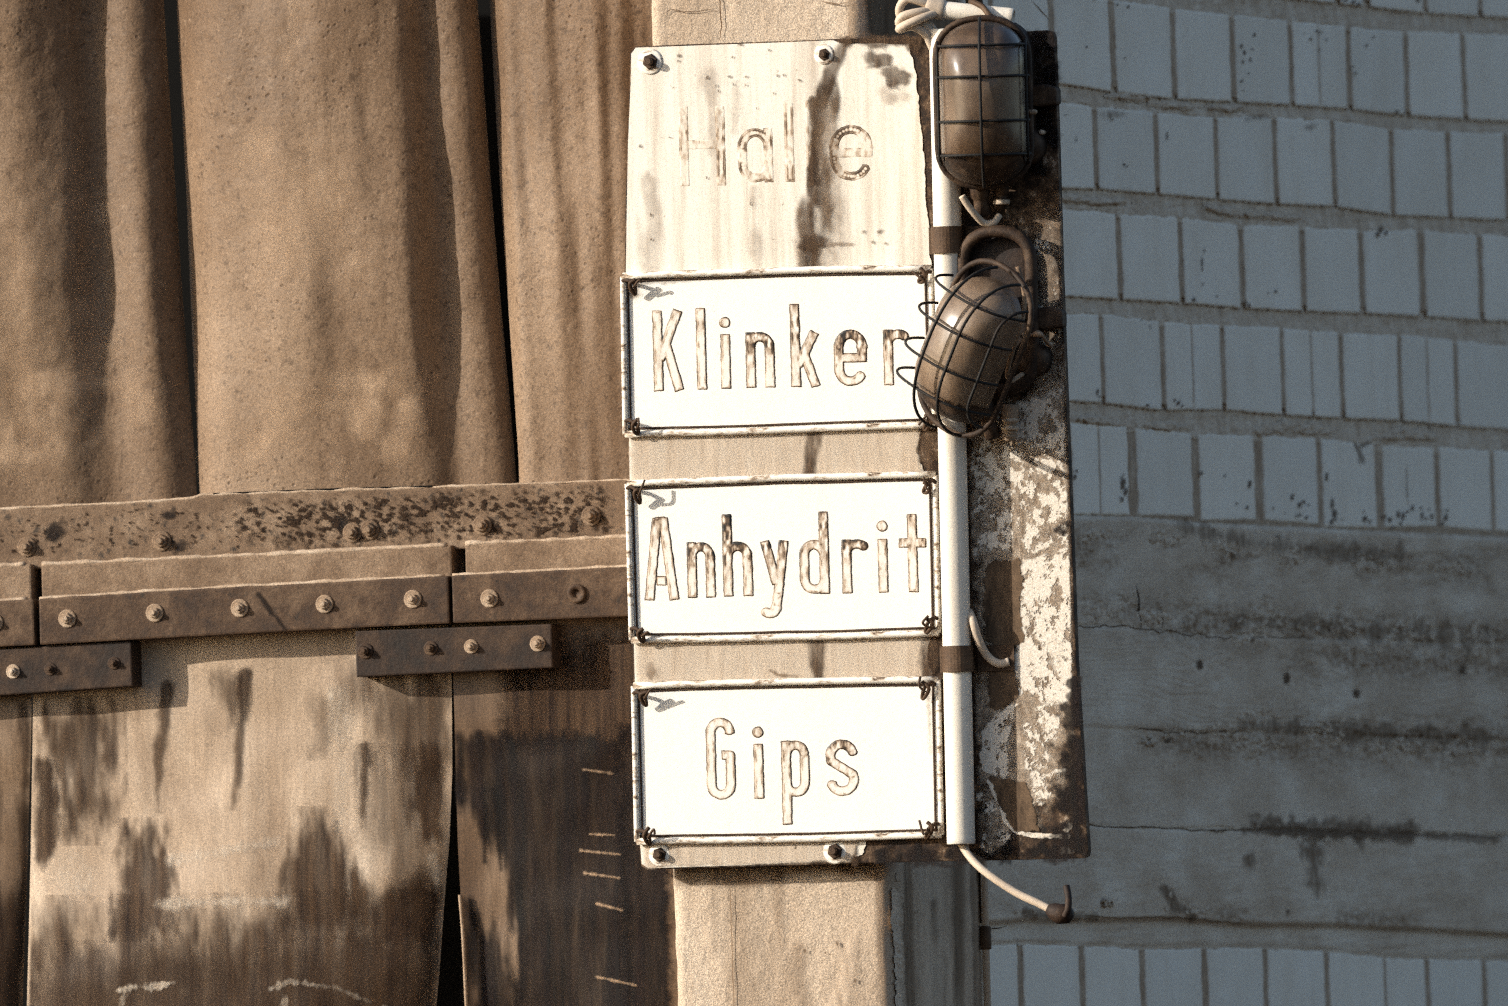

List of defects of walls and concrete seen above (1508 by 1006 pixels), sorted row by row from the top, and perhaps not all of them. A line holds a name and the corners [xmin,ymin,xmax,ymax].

corrosion [773,34,922,267]
corrosion [630,428,933,480]
corrosion [0,485,608,554]
peeling [970,367,1072,853]
damp [1242,814,1499,891]